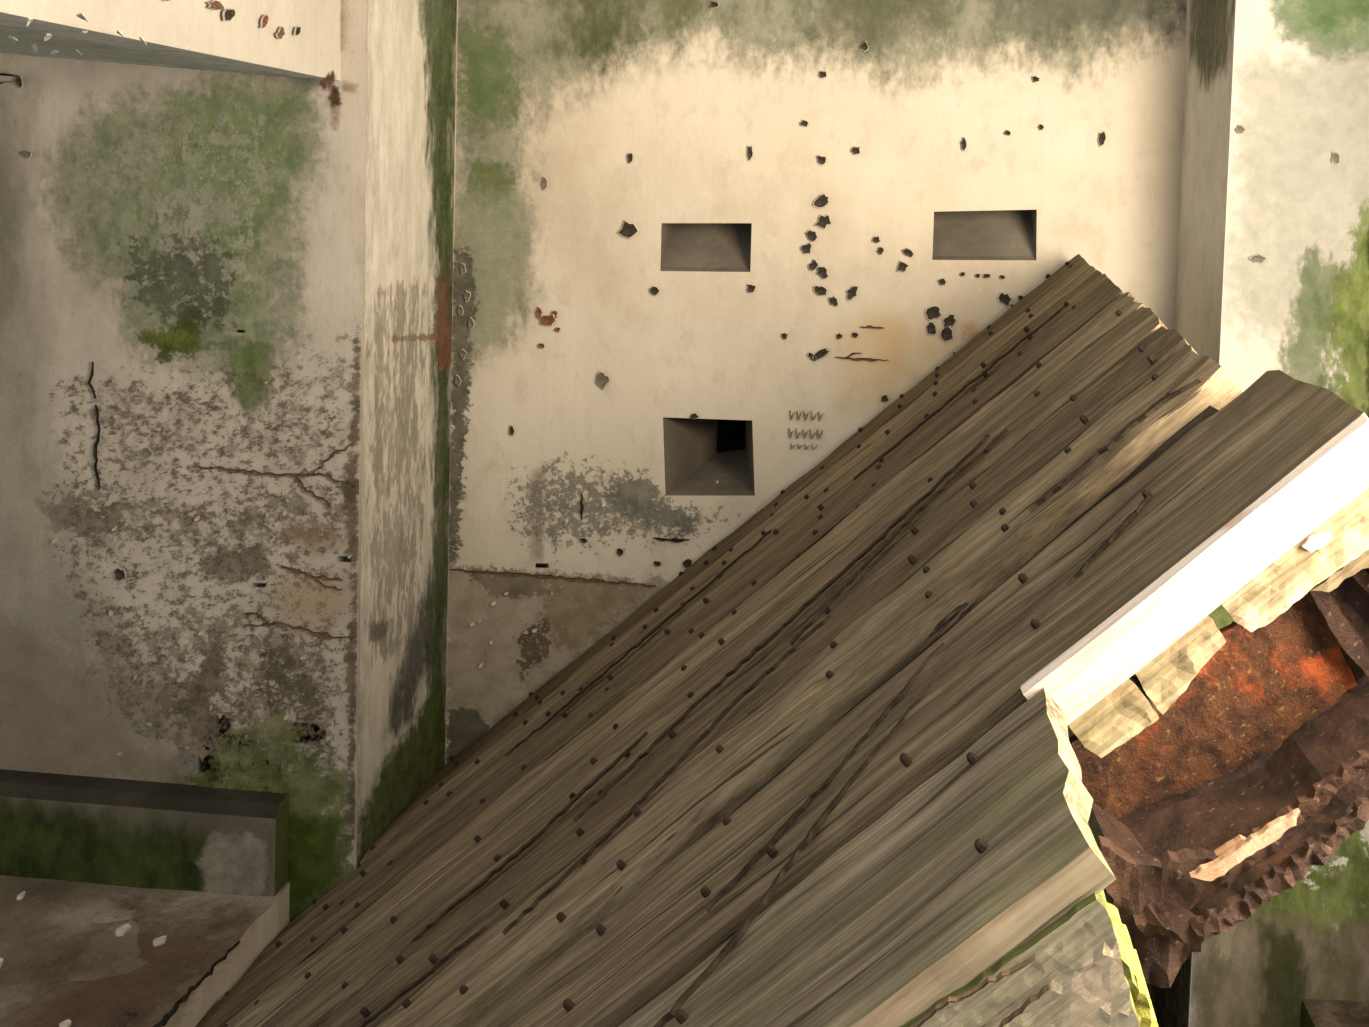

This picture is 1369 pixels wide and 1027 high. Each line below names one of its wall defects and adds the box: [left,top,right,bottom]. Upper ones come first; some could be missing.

water stain [576,0,631,74]
rust [320,72,352,113]
rust [392,271,452,371]
crack [88,362,101,490]
water stain [0,102,219,785]
water stain [229,345,271,410]
peeling [35,328,361,828]
water stain [1088,808,1104,846]
crack [153,940,240,1027]
water stain [1147,916,1369,1027]